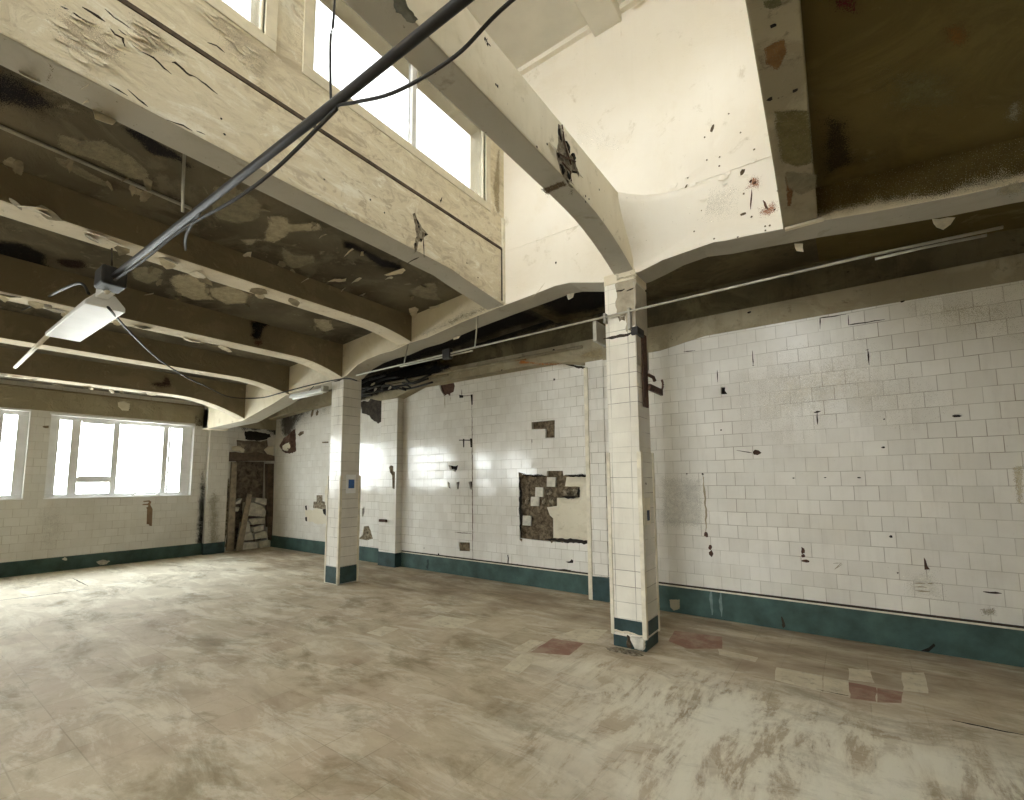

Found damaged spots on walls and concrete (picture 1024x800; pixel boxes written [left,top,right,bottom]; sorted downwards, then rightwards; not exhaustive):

crack [61,6,217,94]
crack [109,84,204,134]
spalling [536,124,583,188]
water stain [774,109,1024,219]
peeling [9,198,63,221]
peeling [211,185,326,283]
spalling [413,213,428,253]
peeling [131,257,267,307]
peeling [533,421,555,438]
peeling [305,485,329,521]
spalling [359,513,373,540]
peeling [519,471,587,544]